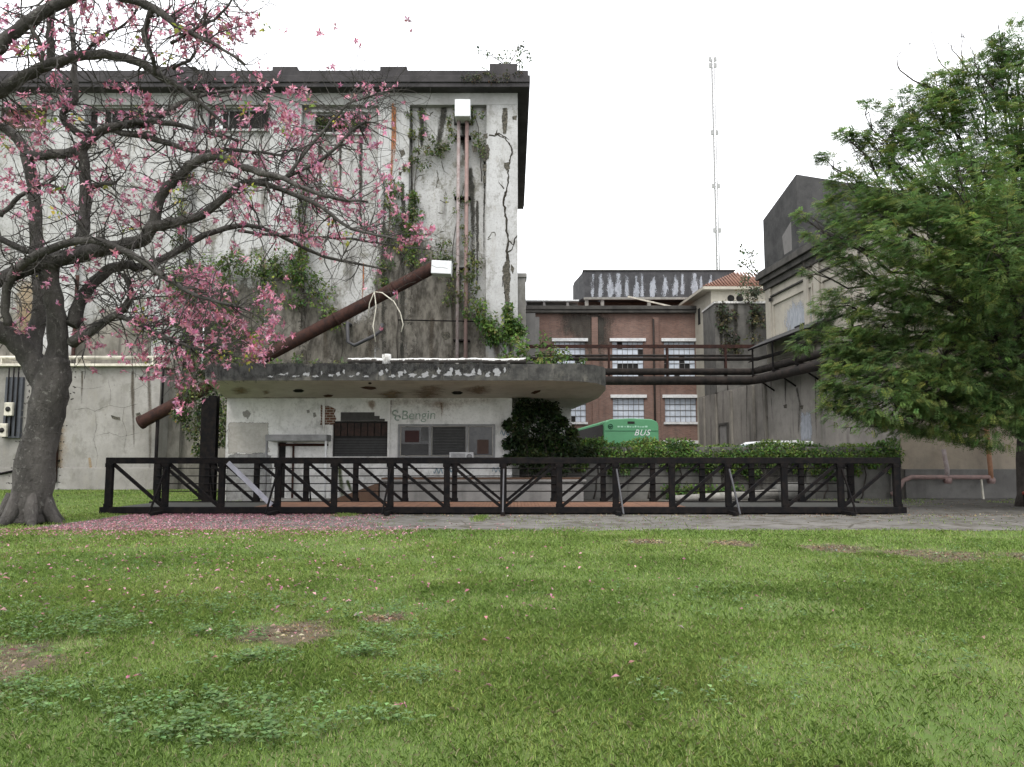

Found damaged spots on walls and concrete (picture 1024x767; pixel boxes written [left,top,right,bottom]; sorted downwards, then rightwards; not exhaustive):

leakage [400,107,447,277]
leakage [460,125,486,286]
crack [489,130,517,299]
flaking render [307,394,336,425]
peeling [208,218,506,390]
leakage [203,290,512,382]